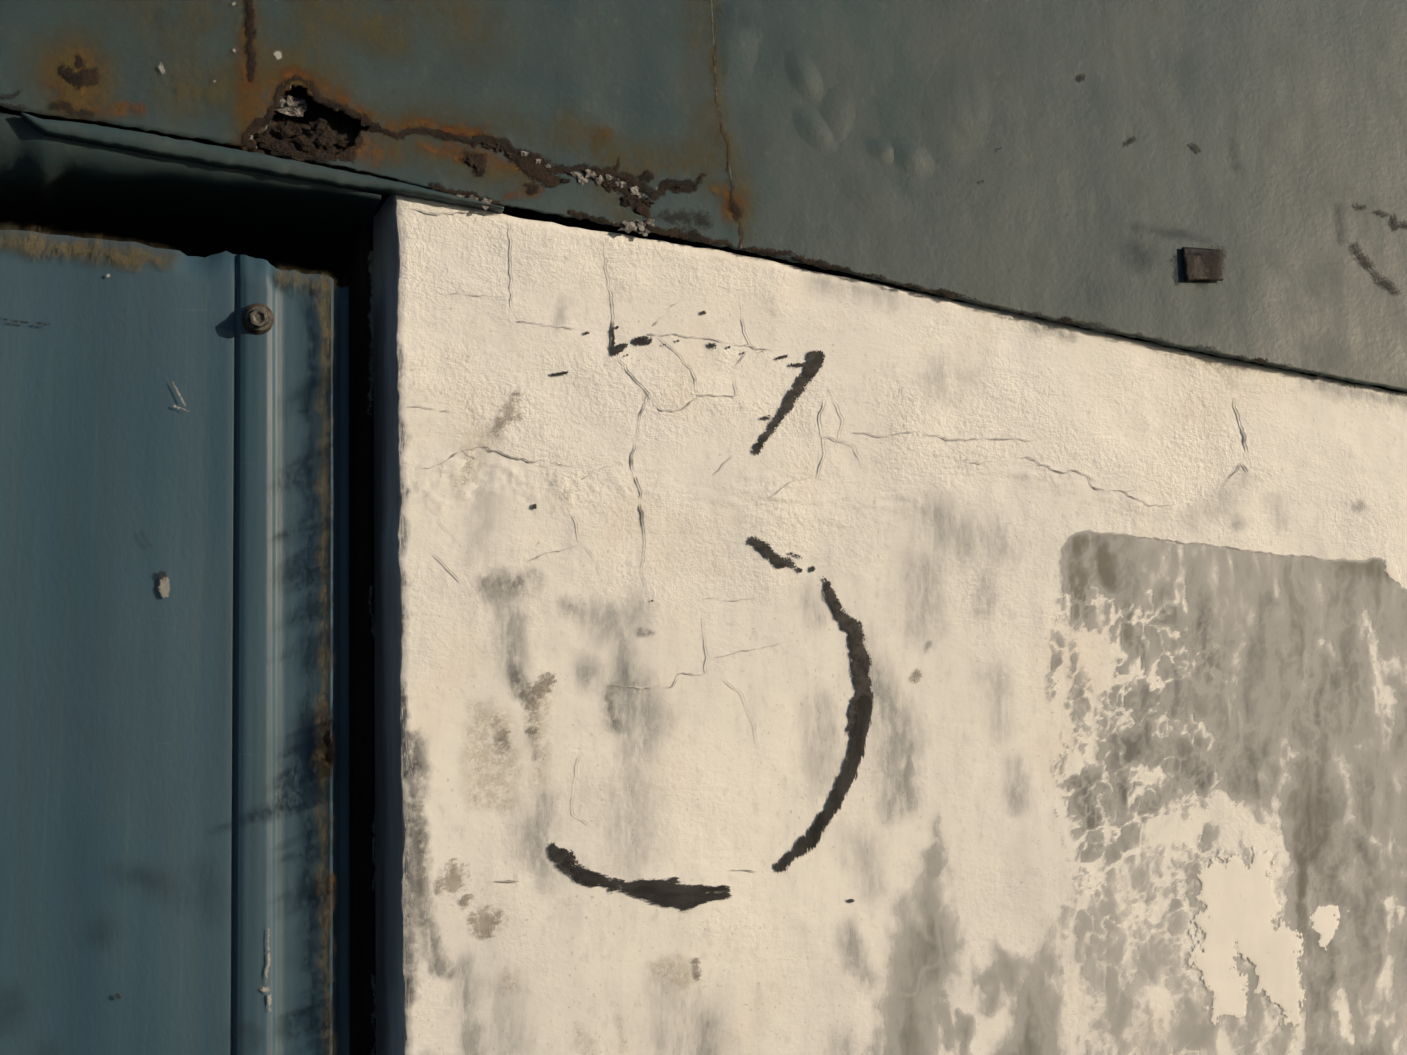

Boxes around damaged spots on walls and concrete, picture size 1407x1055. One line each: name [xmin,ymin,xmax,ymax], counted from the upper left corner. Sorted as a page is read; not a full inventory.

rust [47,48,145,119]
rust [240,0,522,173]
rust [428,182,541,206]
crack [409,208,577,330]
rust [569,22,1339,379]
crack [417,235,769,604]
damp [398,478,429,1001]
damp [482,576,555,735]
damp [606,612,656,730]
peeling [1047,530,1407,1055]
damp [849,818,1063,1055]